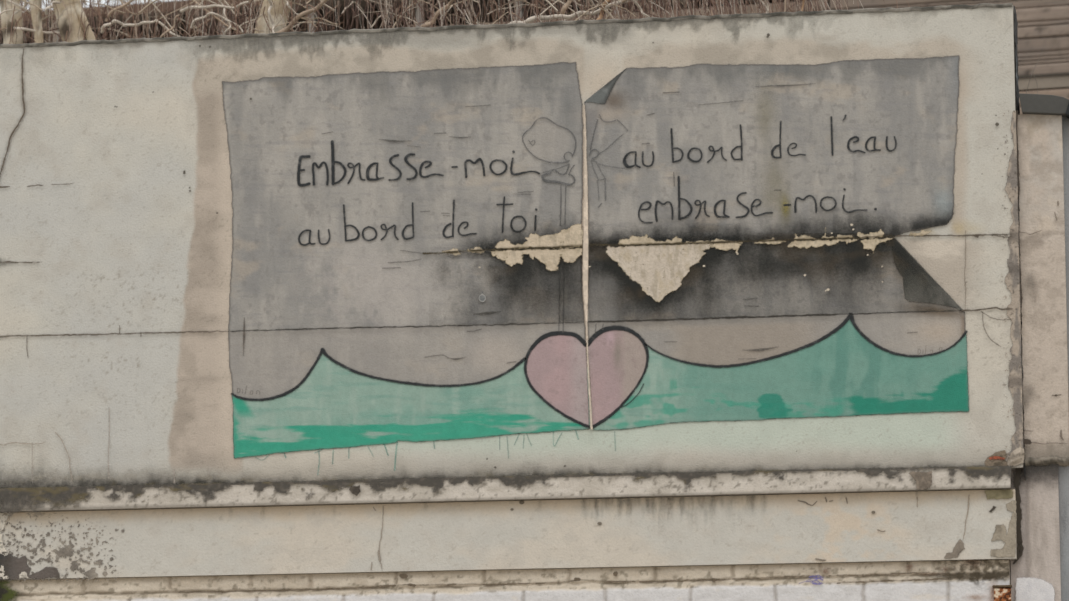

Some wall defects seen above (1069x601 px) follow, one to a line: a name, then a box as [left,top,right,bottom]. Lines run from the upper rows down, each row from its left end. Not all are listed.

crack [0,48,72,188]
peeling [442,224,583,271]
leakage [471,216,952,319]
peeling [606,224,893,302]
leakage [0,464,1059,516]
peeling [0,513,124,581]
spalling [944,539,965,559]
spalling [989,500,1017,557]